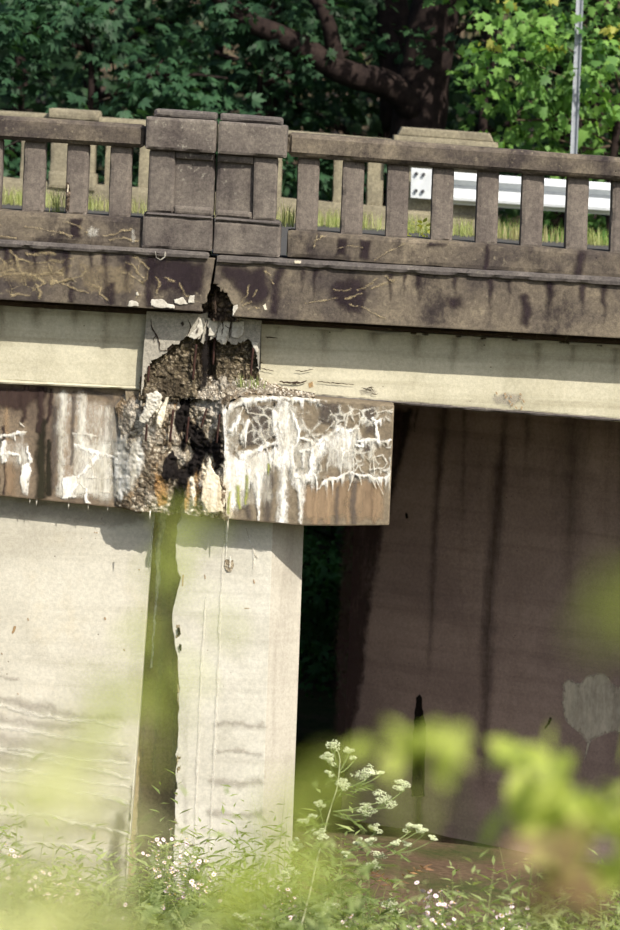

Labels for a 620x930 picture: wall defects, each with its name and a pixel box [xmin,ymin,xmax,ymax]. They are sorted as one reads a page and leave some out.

crack [3,223,107,300]
crack [111,229,187,297]
water stain [221,265,284,314]
water stain [332,279,366,312]
water stain [360,240,371,259]
water stain [521,294,531,325]
water stain [575,251,585,300]
spalling [115,278,260,520]
water stain [0,386,143,509]
rust [155,474,167,506]
rust [183,470,203,509]
water stain [149,396,417,780]